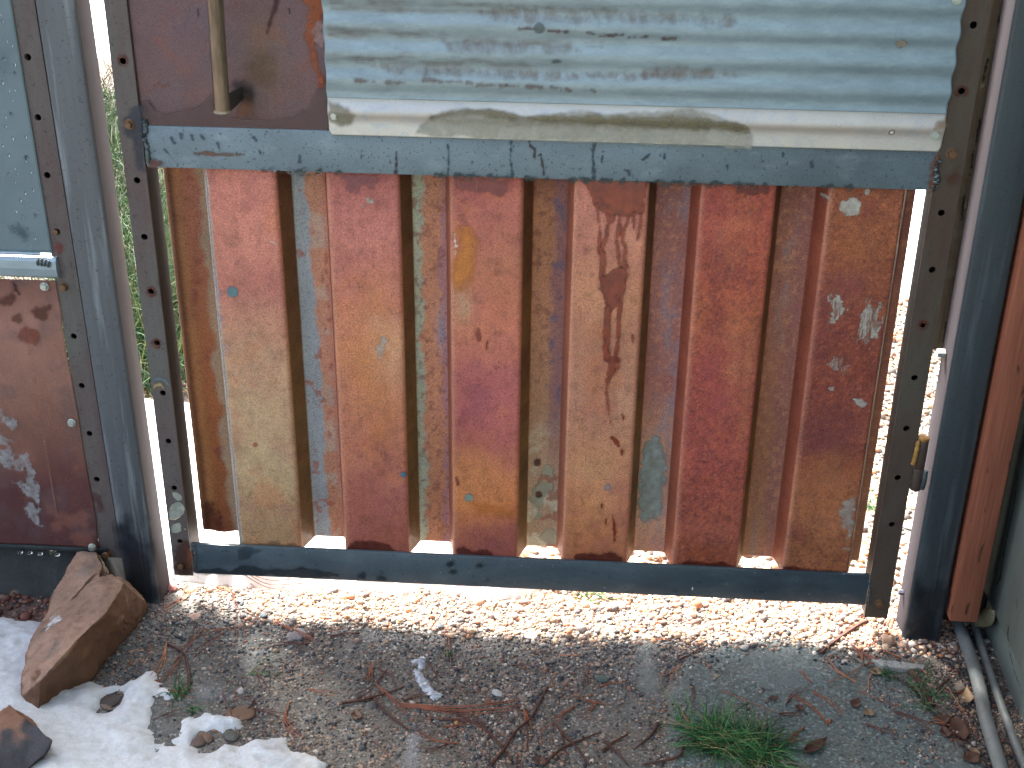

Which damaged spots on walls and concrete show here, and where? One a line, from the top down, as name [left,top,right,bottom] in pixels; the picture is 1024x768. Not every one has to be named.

rust [303,0,324,87]
water stain [417,110,752,196]
peeling [820,189,870,216]
rust [586,181,647,386]
peeling [828,294,848,323]
peeling [858,302,884,340]
rust [0,279,103,548]
peeling [638,436,669,522]
rust [174,541,194,575]